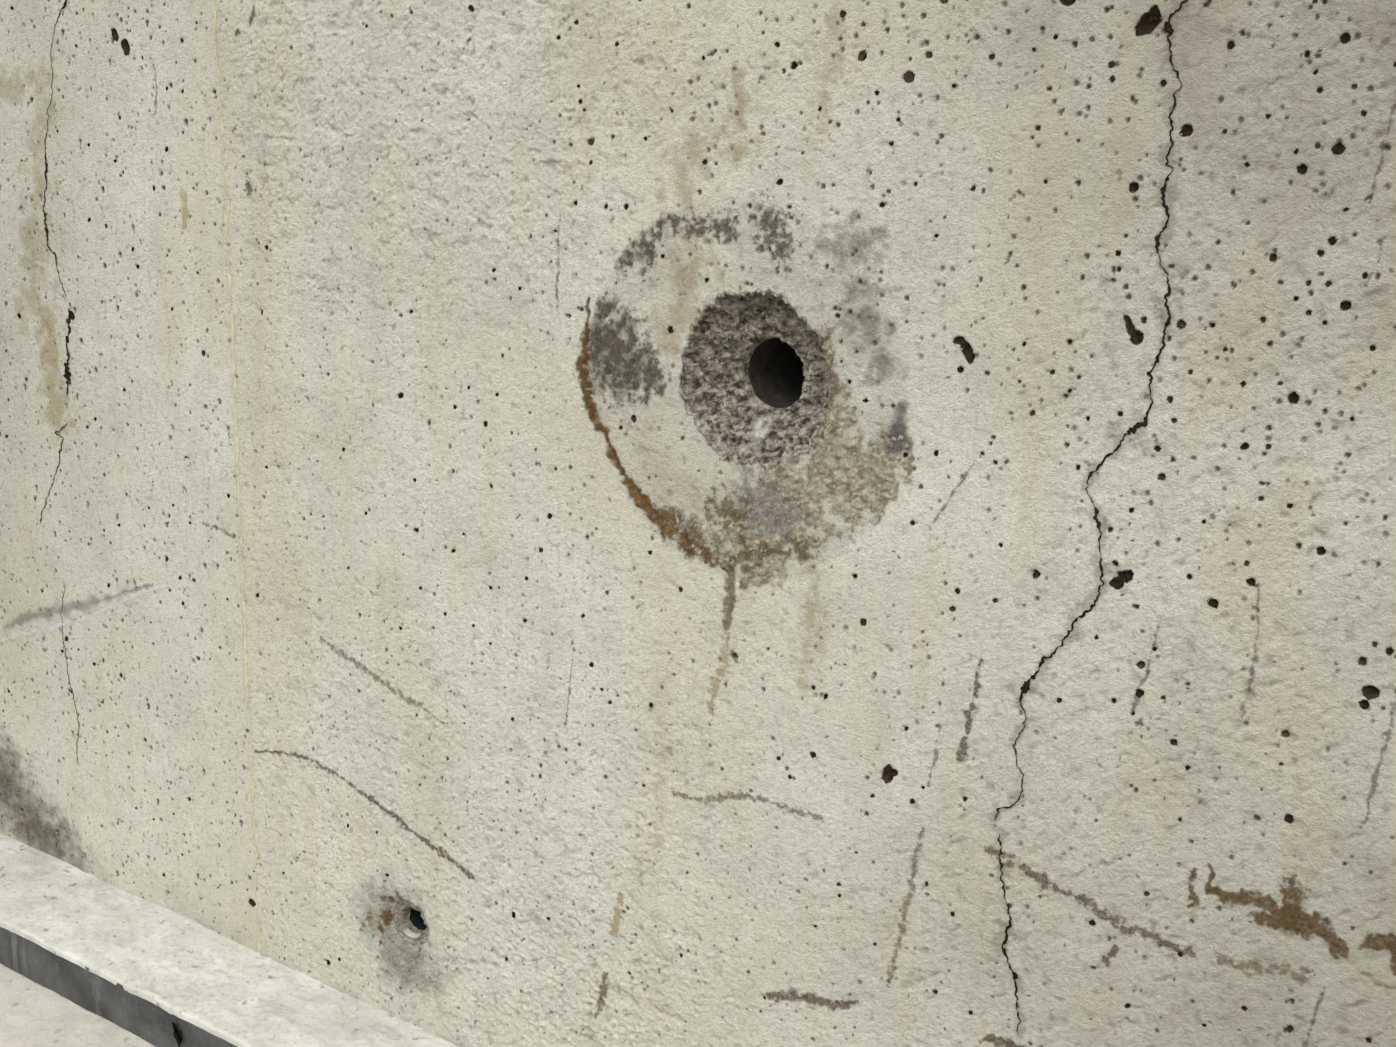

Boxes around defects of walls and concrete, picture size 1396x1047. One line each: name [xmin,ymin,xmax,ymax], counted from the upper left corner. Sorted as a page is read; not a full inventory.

crack [40,0,75,524]
corrosion [707,563,737,715]
corrosion [818,333,839,400]
crack [994,0,1188,1032]